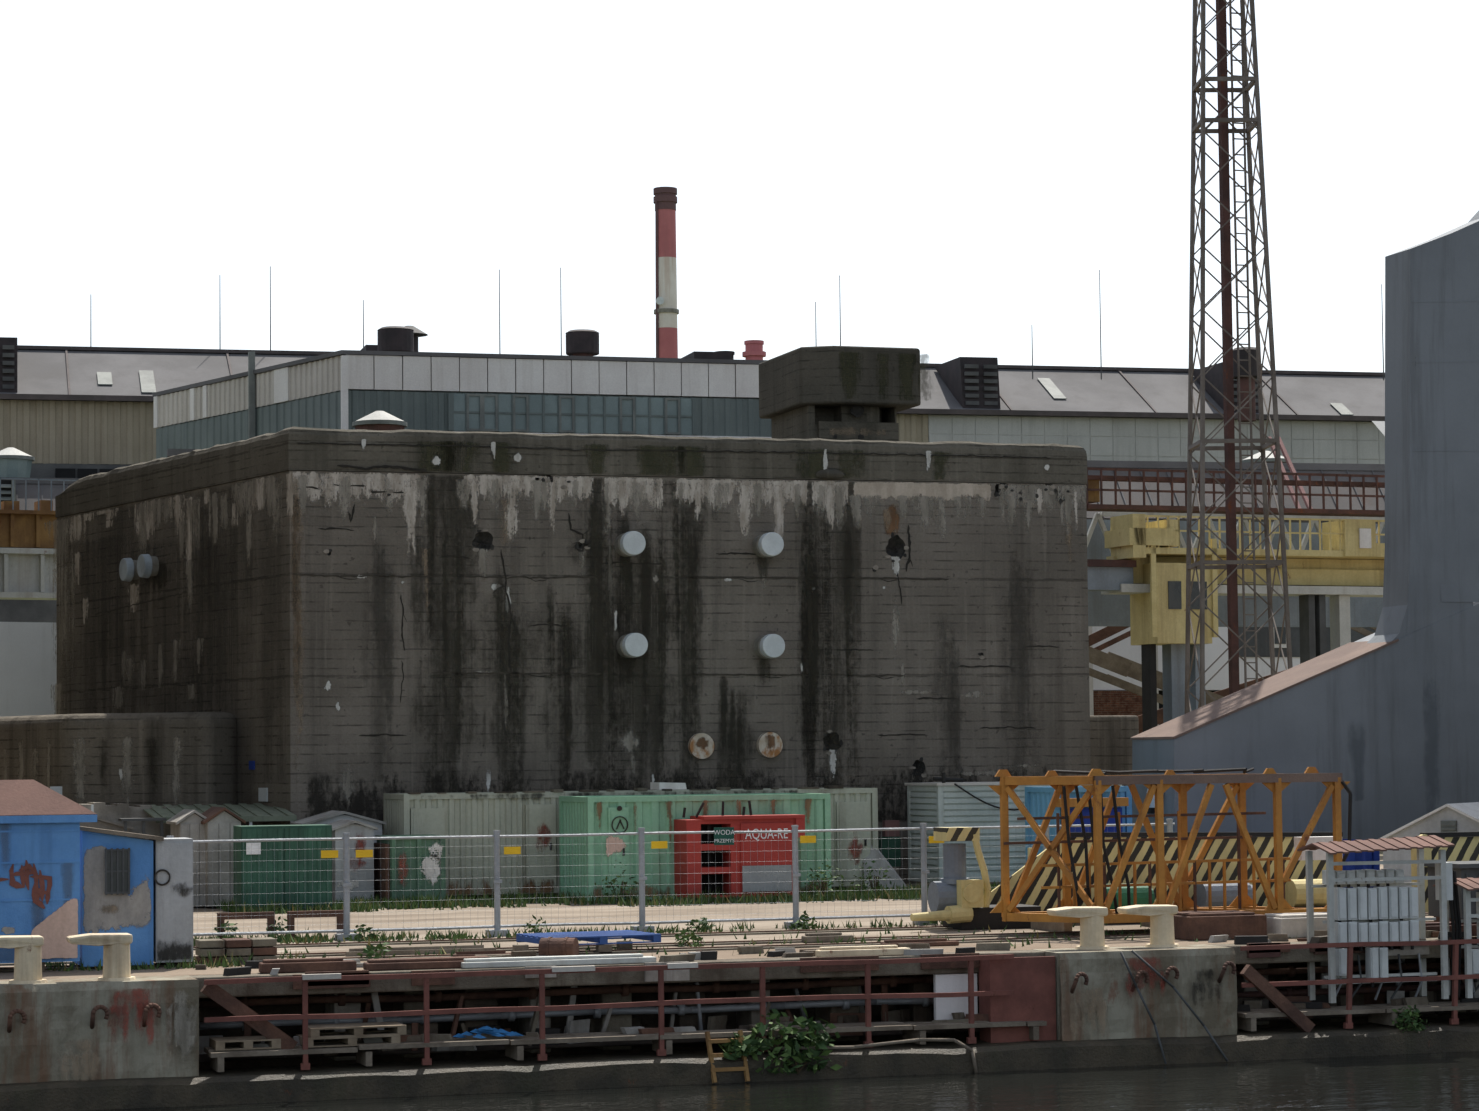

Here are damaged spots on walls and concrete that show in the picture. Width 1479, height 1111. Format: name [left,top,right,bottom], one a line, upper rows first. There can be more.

leakage [44,442,861,792]
peeling [849,482,1074,575]